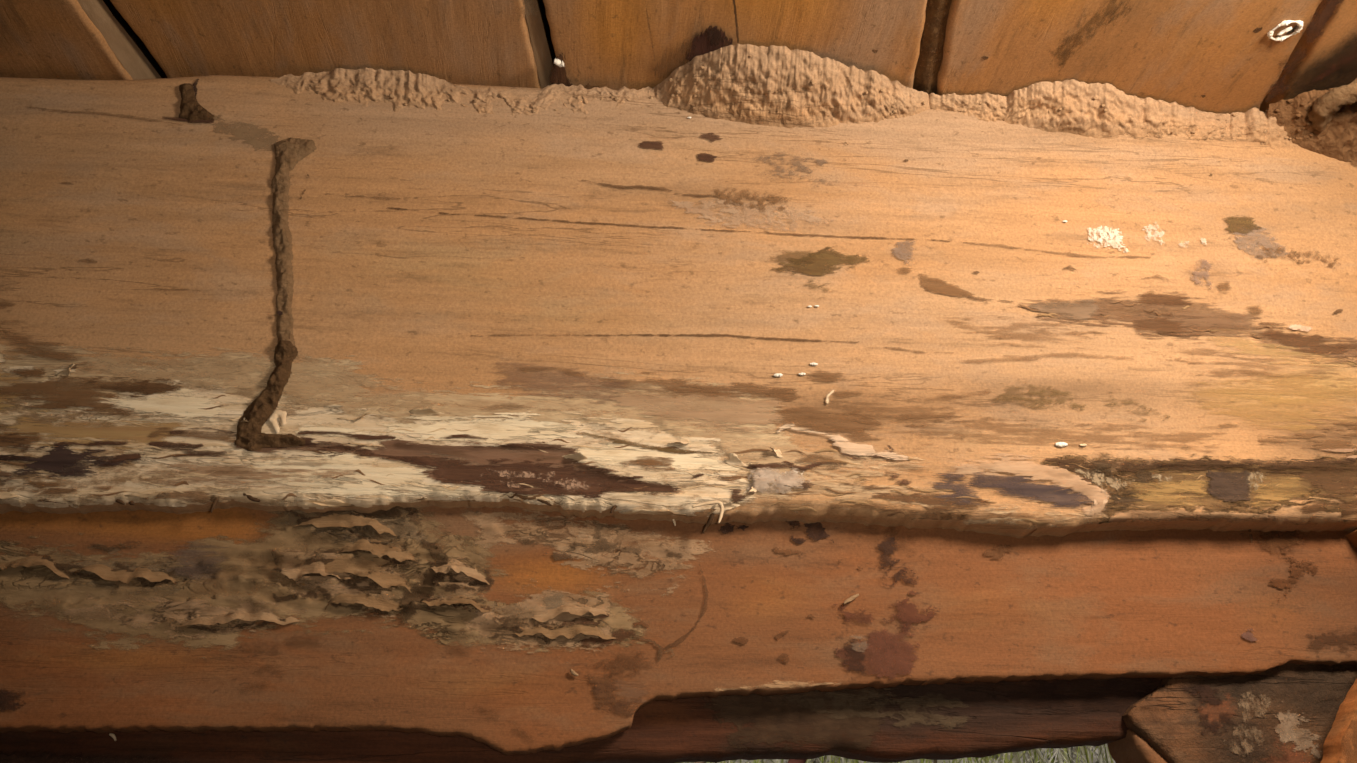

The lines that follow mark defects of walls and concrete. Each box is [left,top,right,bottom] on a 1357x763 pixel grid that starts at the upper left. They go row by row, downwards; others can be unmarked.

damp [772,246,870,282]
damp [1288,324,1312,332]
peeling [0,344,1112,658]
damp [0,690,25,712]